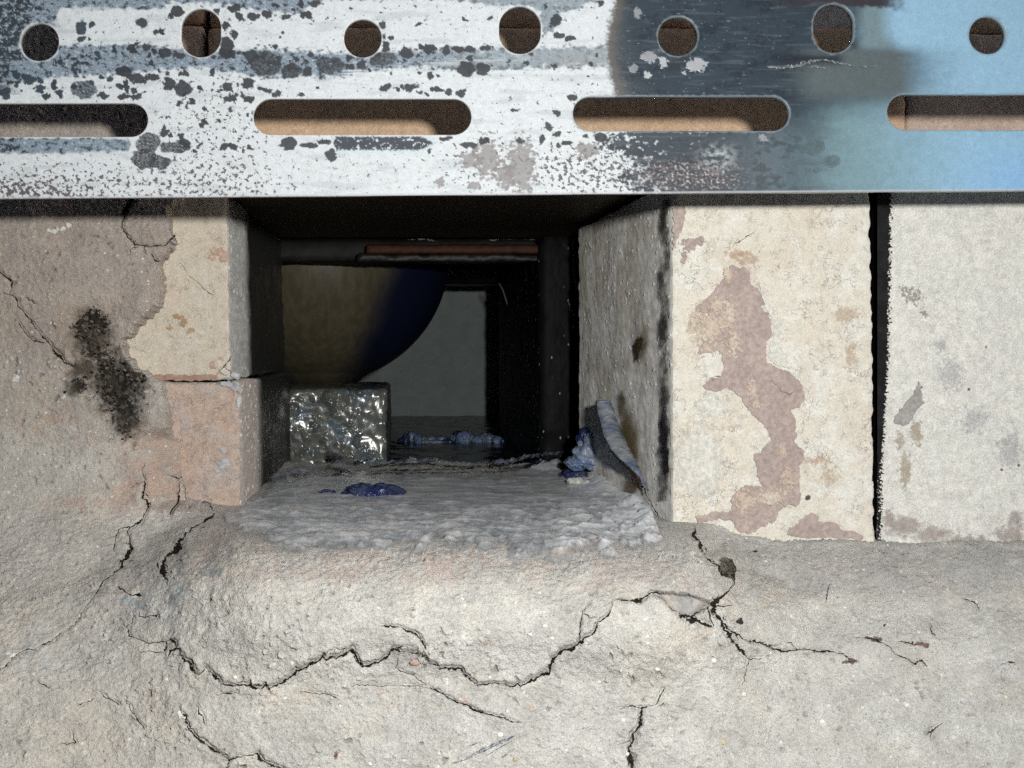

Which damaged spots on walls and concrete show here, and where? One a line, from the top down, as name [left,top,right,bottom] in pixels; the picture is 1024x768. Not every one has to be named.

crack [0,272,76,367]
crack [121,199,213,295]
peeling [696,265,805,534]
crack [0,465,665,768]
crack [680,527,936,683]
peeling [787,513,864,541]